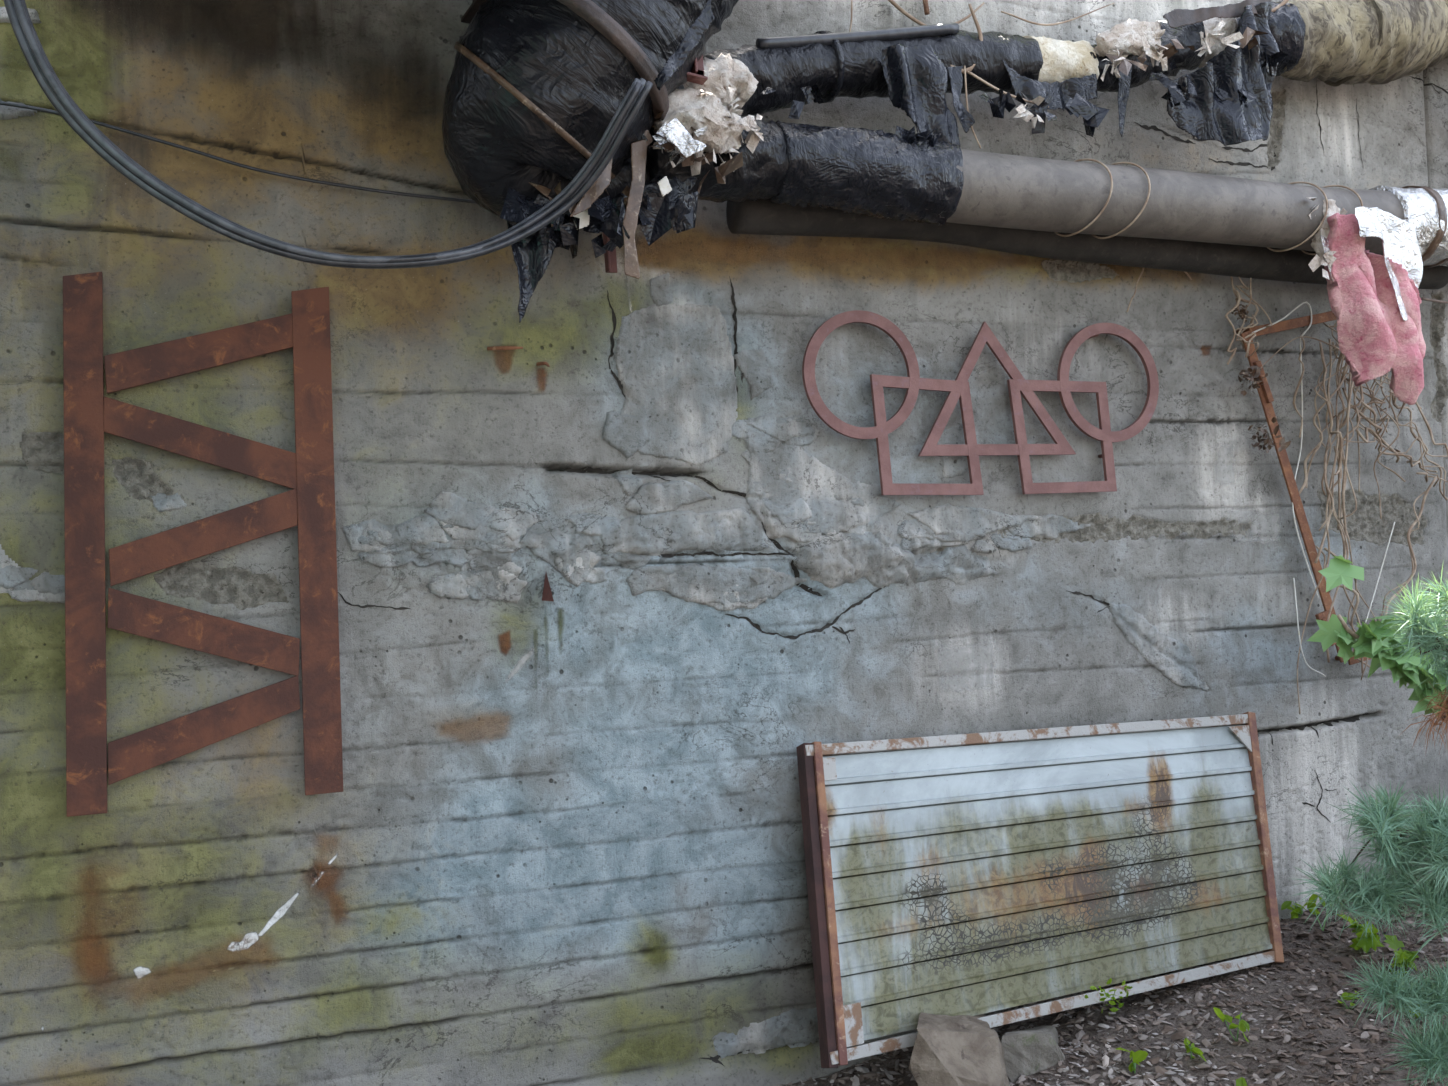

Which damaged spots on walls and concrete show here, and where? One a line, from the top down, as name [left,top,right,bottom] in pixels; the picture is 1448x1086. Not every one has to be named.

spalling [1041,259,1118,283]
crack [607,290,626,398]
crack [729,276,744,393]
flaking render [342,273,1253,611]
flaking render [0,544,65,603]
crack [1068,591,1110,613]
damp [228,855,337,951]
damp [134,967,151,978]